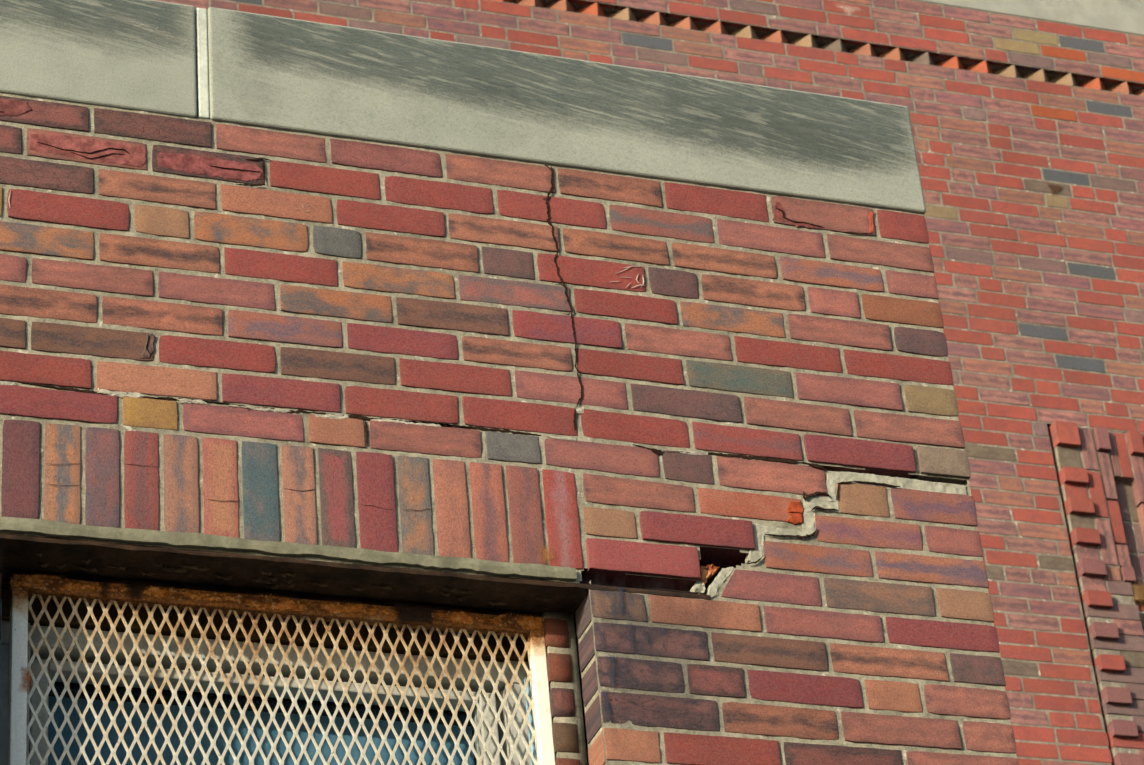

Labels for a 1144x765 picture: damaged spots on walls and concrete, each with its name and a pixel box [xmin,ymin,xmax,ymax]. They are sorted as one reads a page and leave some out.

spalling [0,98,32,116]
spalling [29,133,271,187]
spalling [773,201,874,234]
crack [0,165,585,446]
crack [633,444,967,598]
rust [11,574,544,632]